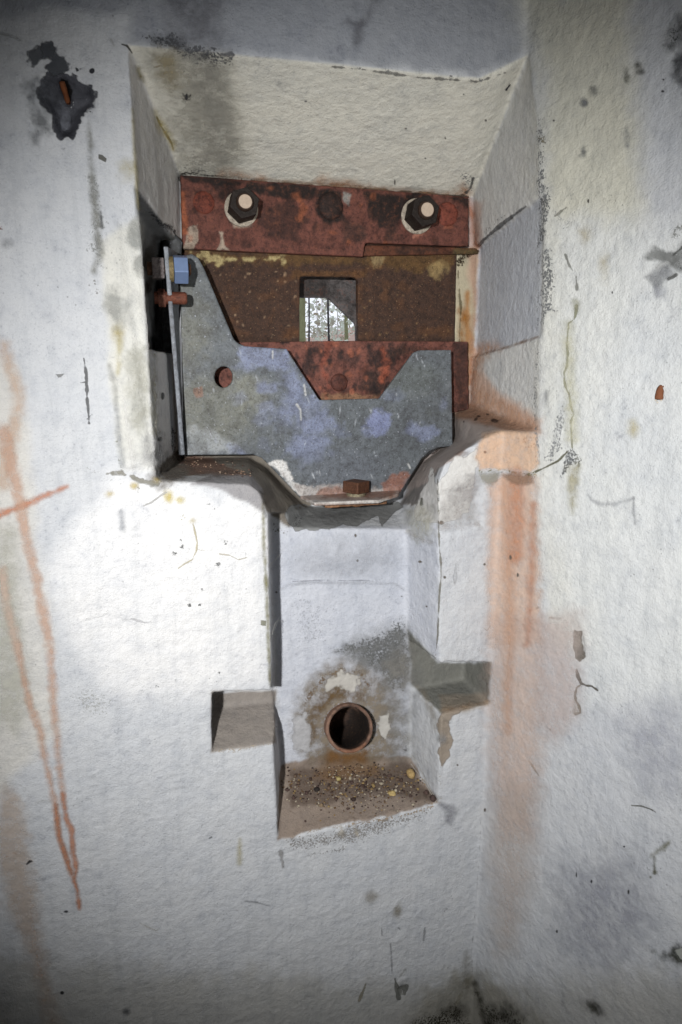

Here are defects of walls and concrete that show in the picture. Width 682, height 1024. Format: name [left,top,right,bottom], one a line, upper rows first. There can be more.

spalling [27,41,97,141]
damp [142,32,267,182]
damp [308,173,474,198]
crack [479,254,581,505]
rust [0,430,64,536]
rust [458,347,569,826]
damp [292,617,412,762]
peeling [437,703,470,781]
spalling [573,630,586,662]
crack [574,669,598,715]
rust [55,793,80,909]